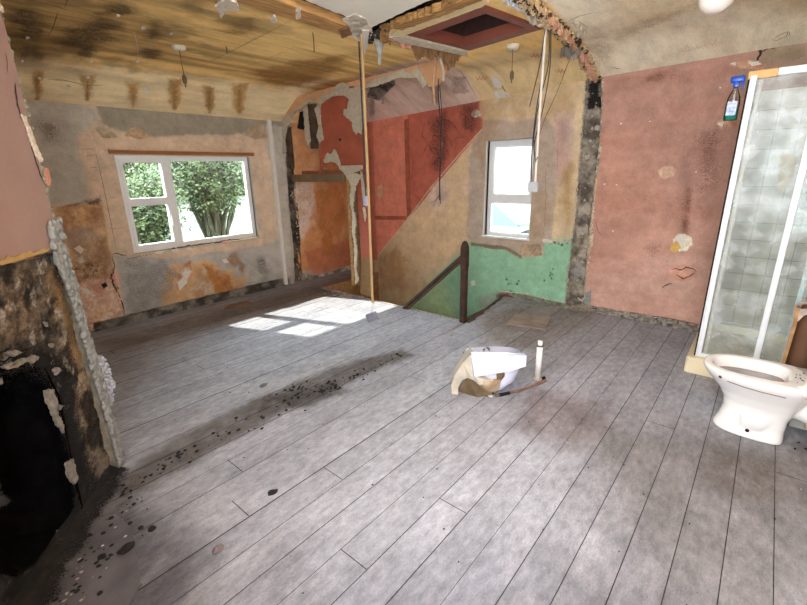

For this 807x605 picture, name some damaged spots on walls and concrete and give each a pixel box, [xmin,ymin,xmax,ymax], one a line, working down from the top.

water stain [2,0,275,102]
water stain [122,81,143,108]
water stain [166,77,184,111]
water stain [200,84,219,113]
flaking render [542,79,700,332]
peeling [3,350,39,364]
peeling [98,355,116,406]
peeling [64,459,78,484]